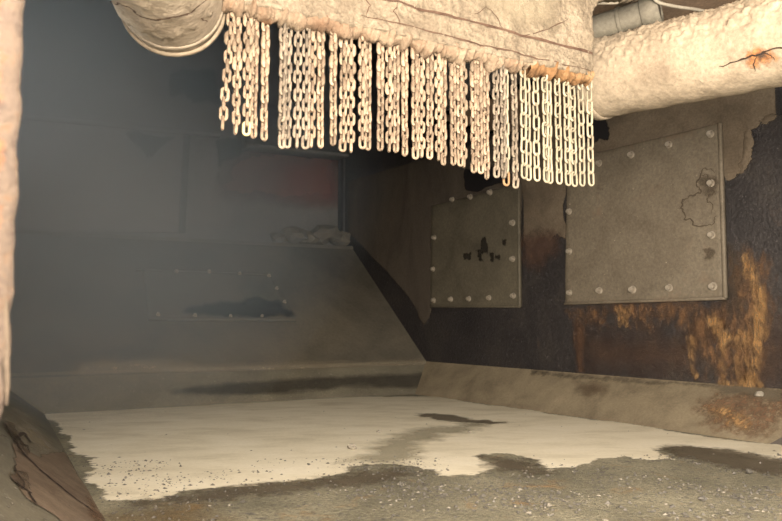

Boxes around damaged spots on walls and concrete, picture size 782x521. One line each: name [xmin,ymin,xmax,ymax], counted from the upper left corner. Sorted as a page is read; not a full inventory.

crack [110,0,208,22]
crack [362,0,592,71]
crack [720,47,782,71]
corrosion [614,250,782,435]
water stain [360,413,501,461]
crack [3,423,100,516]
water stain [486,458,546,474]
water stain [665,446,782,475]
water stain [158,470,409,503]